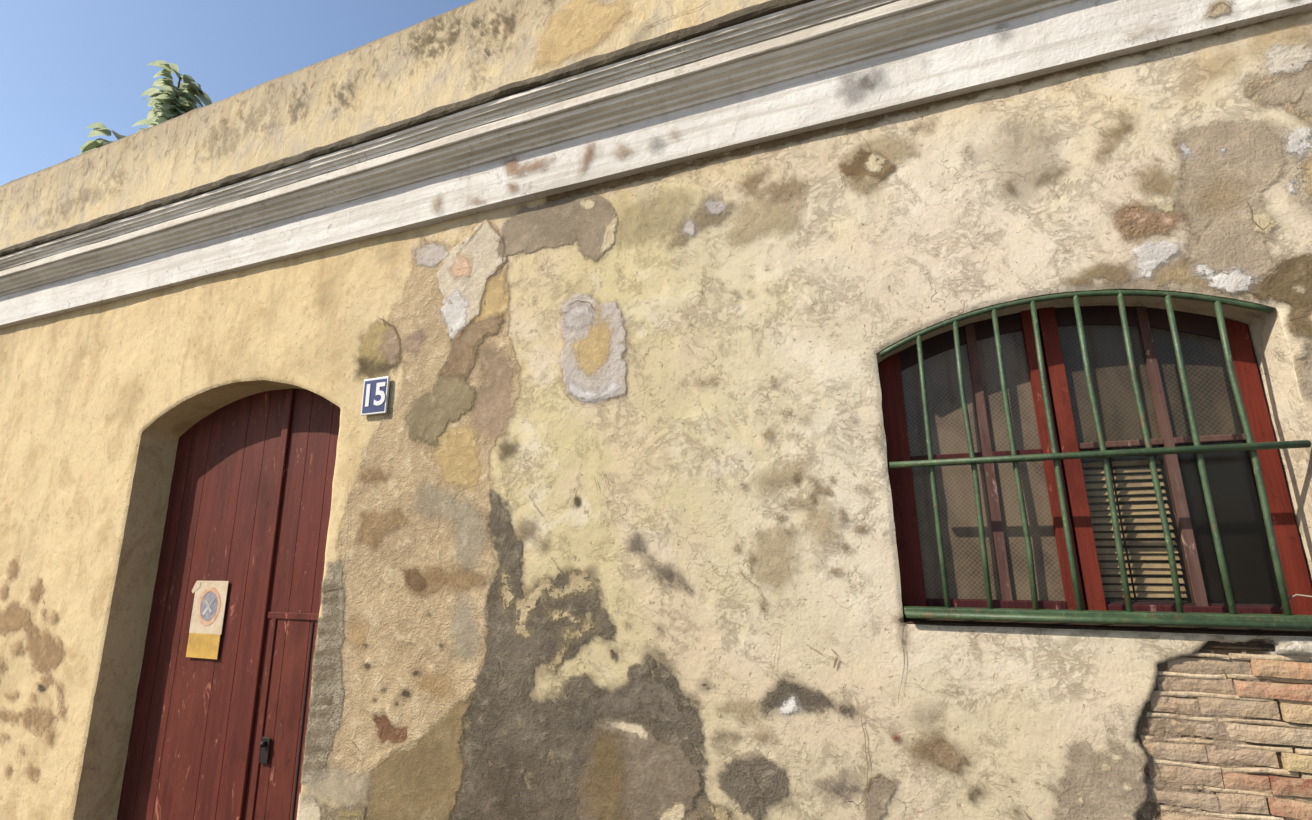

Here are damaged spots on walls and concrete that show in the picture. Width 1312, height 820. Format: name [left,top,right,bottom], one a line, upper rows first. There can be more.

peeling [1205,0,1231,18]
flaking render [838,121,932,193]
flaking render [1113,40,1312,293]
peeling [559,293,648,406]
flaking render [1294,343,1312,396]
peeling [297,238,521,820]
peeling [627,533,693,594]
peeling [0,560,64,782]
peeling [611,721,648,740]
flaking render [718,680,856,739]
flaking render [1045,638,1312,820]
peeling [660,803,685,820]